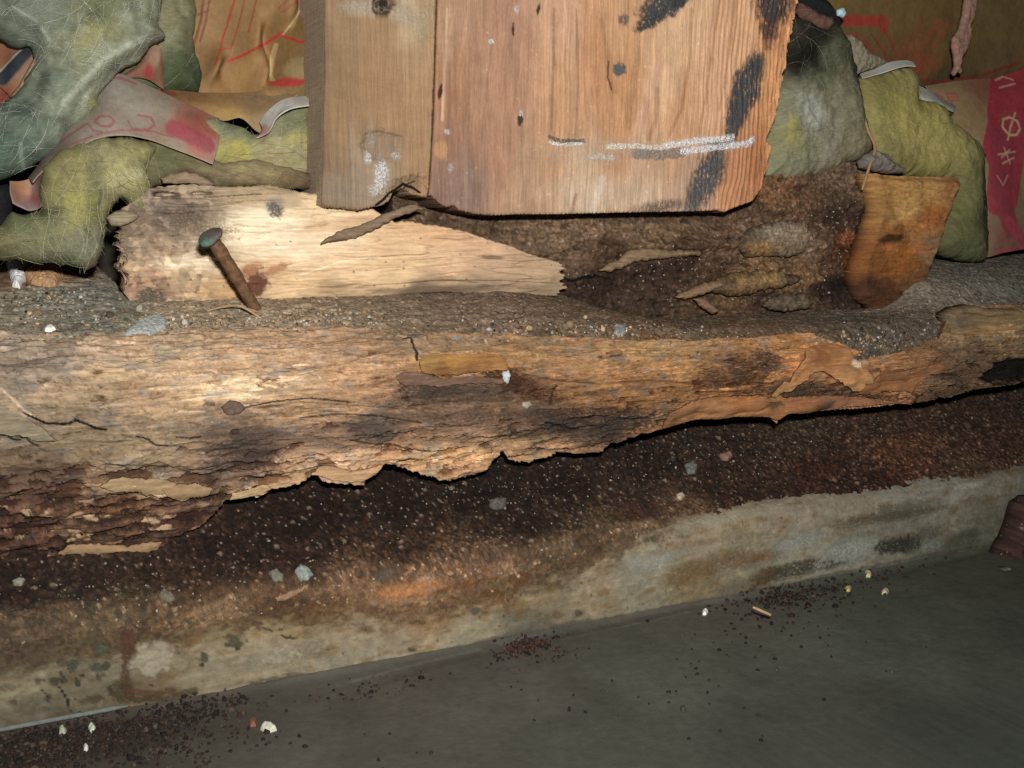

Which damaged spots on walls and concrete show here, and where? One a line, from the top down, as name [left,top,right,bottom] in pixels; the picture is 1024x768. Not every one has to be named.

peeling [0,403,55,441]
peeling [311,464,383,482]
peeling [100,476,213,502]
peeling [229,484,271,500]
water stain [749,534,940,591]
water stain [225,637,242,650]